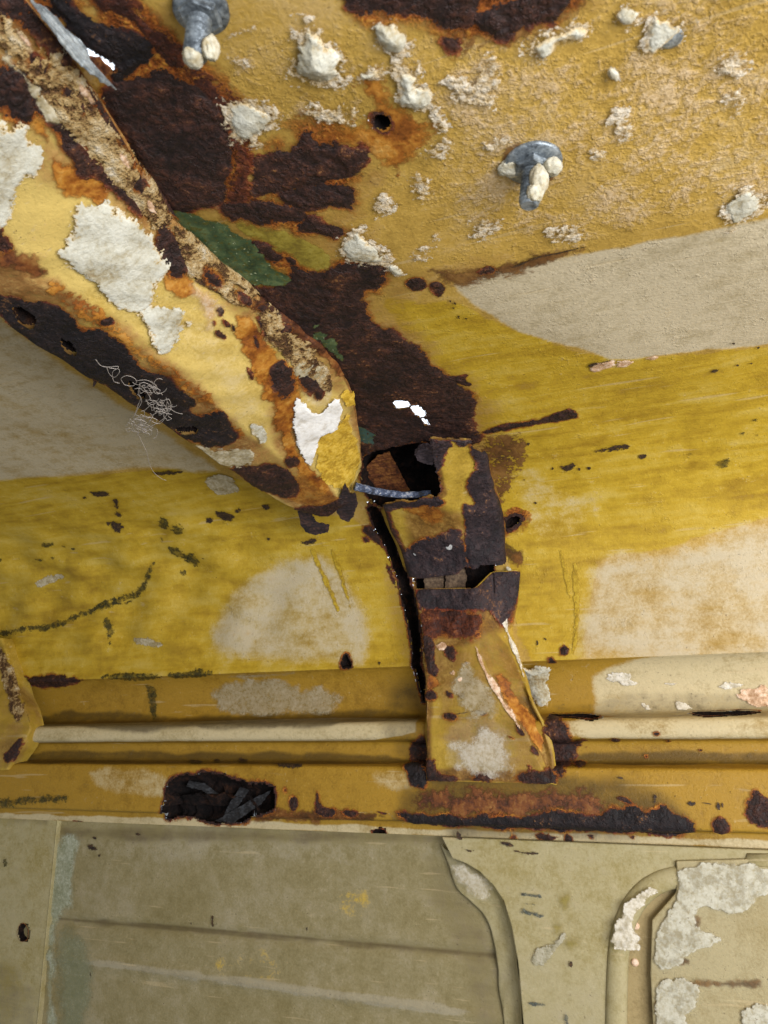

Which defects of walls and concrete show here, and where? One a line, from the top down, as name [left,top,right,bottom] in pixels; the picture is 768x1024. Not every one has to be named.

rust [342,0,586,57]
peeling [0,12,333,392]
rust [0,0,436,299]
rust [0,227,245,448]
rust [213,239,584,705]
rust [255,673,696,841]
peeling [451,648,520,729]
rust [743,789,768,829]
peeling [612,887,658,951]
peeling [654,862,768,1024]